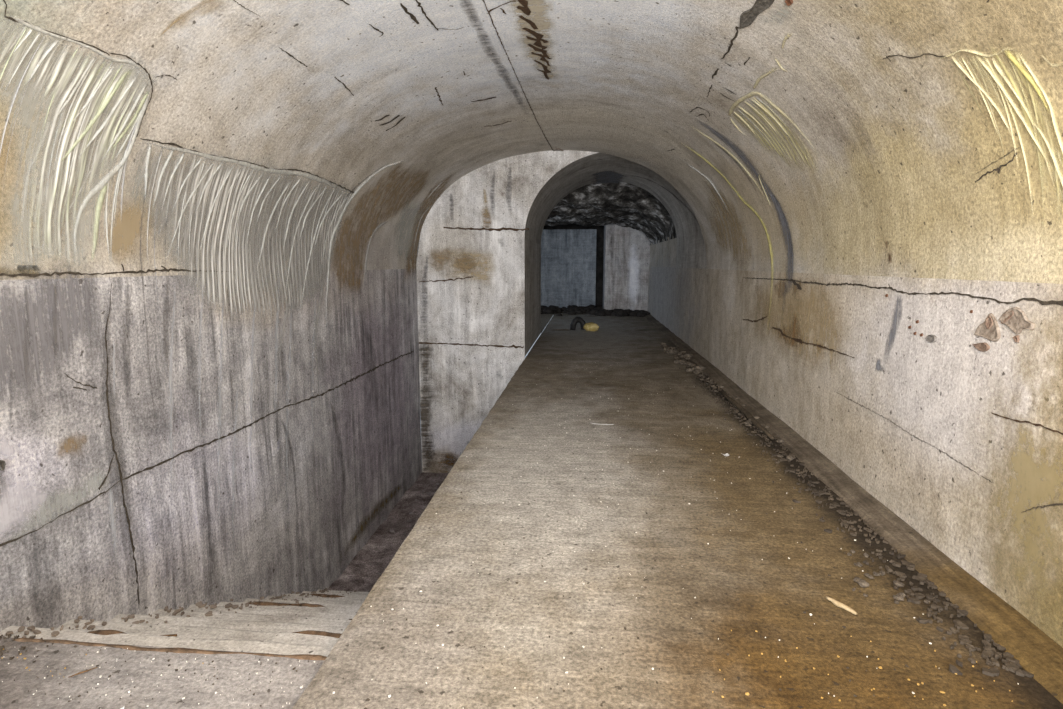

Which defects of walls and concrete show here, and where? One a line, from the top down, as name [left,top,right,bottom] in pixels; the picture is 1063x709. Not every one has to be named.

water stain [692,124,793,286]
water stain [729,61,809,164]
crack [975,147,1019,183]
water stain [944,50,1063,197]
water stain [0,21,397,545]
crack [747,277,1063,306]
spalling [908,320,937,342]
spalling [973,307,1035,352]
crack [0,264,524,604]
crack [1021,503,1063,513]